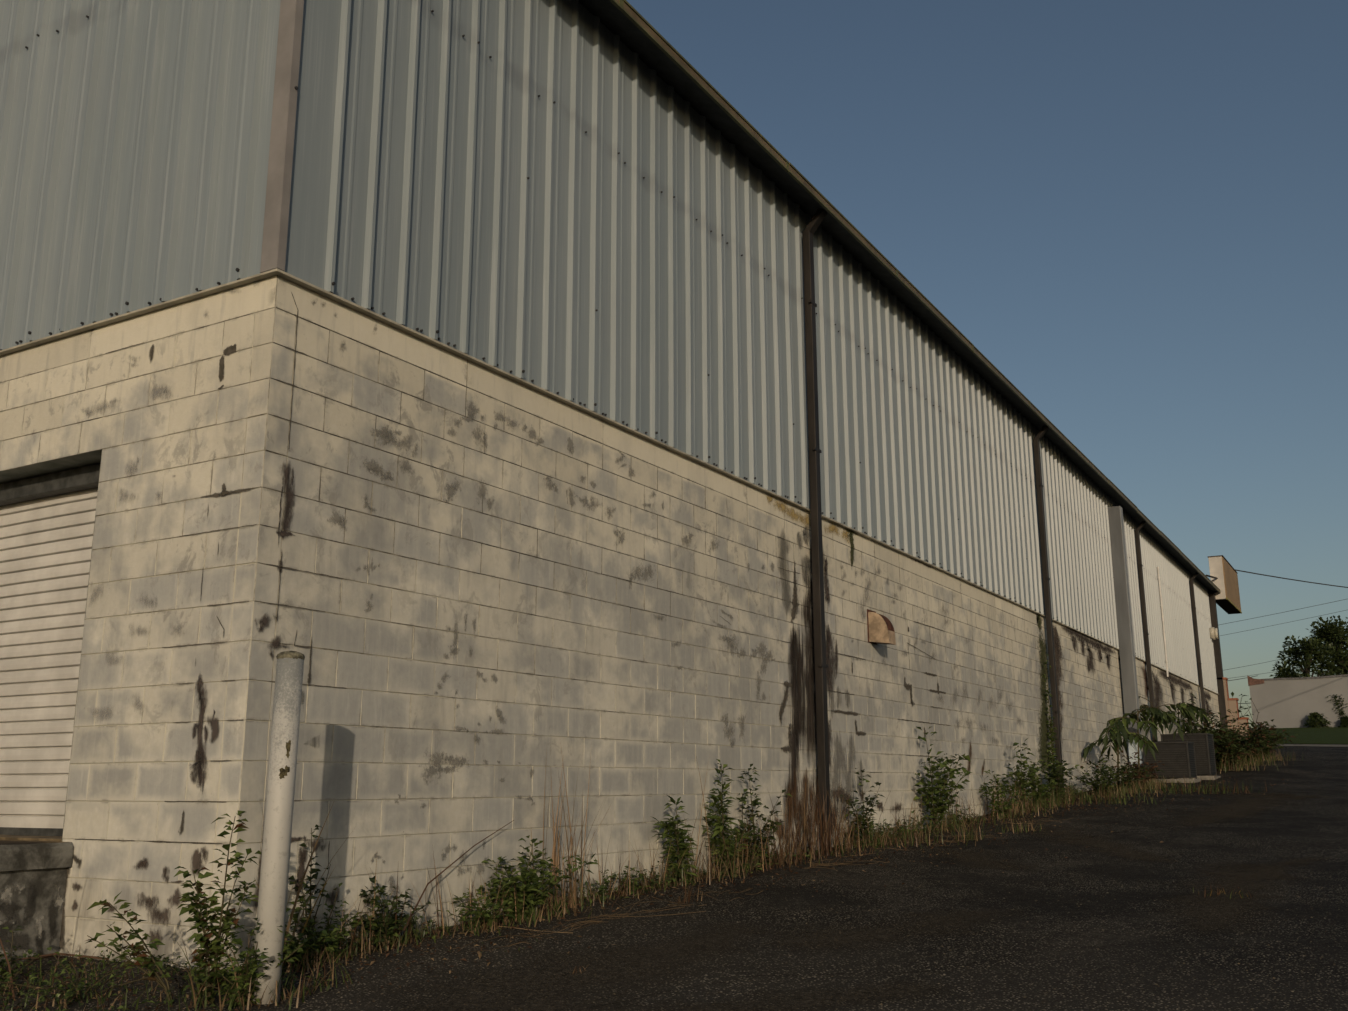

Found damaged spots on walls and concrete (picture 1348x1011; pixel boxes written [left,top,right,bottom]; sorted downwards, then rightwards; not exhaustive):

damp [276,464,294,544]
damp [190,677,219,792]
damp [780,527,901,841]
damp [1030,615,1120,781]
damp [0,884,80,962]
damp [138,848,207,947]